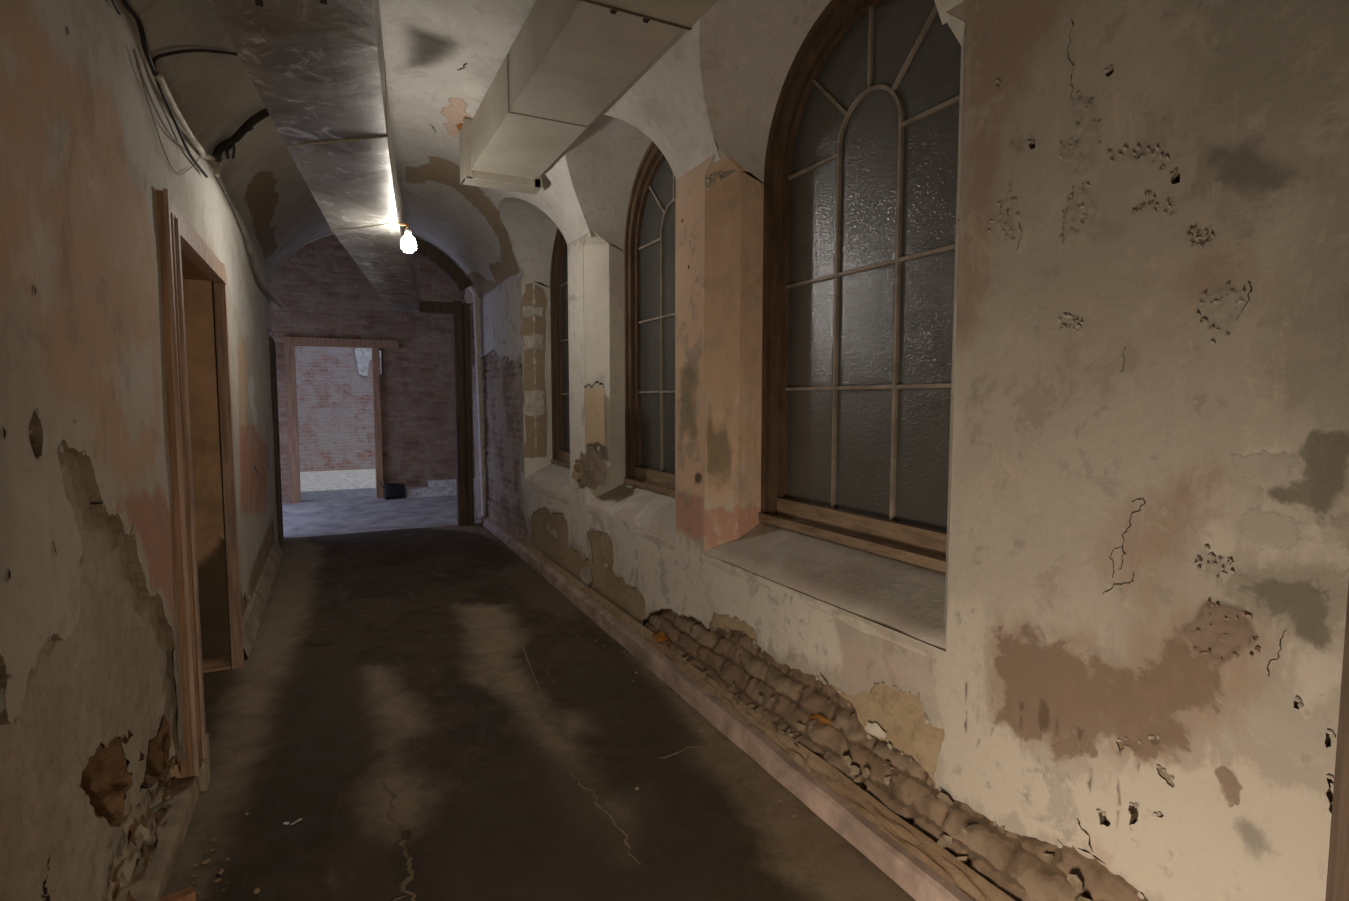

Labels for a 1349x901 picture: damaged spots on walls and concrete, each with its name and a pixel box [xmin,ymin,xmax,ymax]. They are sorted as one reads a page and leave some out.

crack [1067,19,1075,99]
peeling [442,98,470,139]
peeling [245,171,279,259]
flaking render [406,156,1148,901]
crack [1103,498,1146,594]
spalling [0,445,182,901]
crack [379,732,416,901]
spalling [1129,803,1162,822]
peeling [1215,766,1241,807]